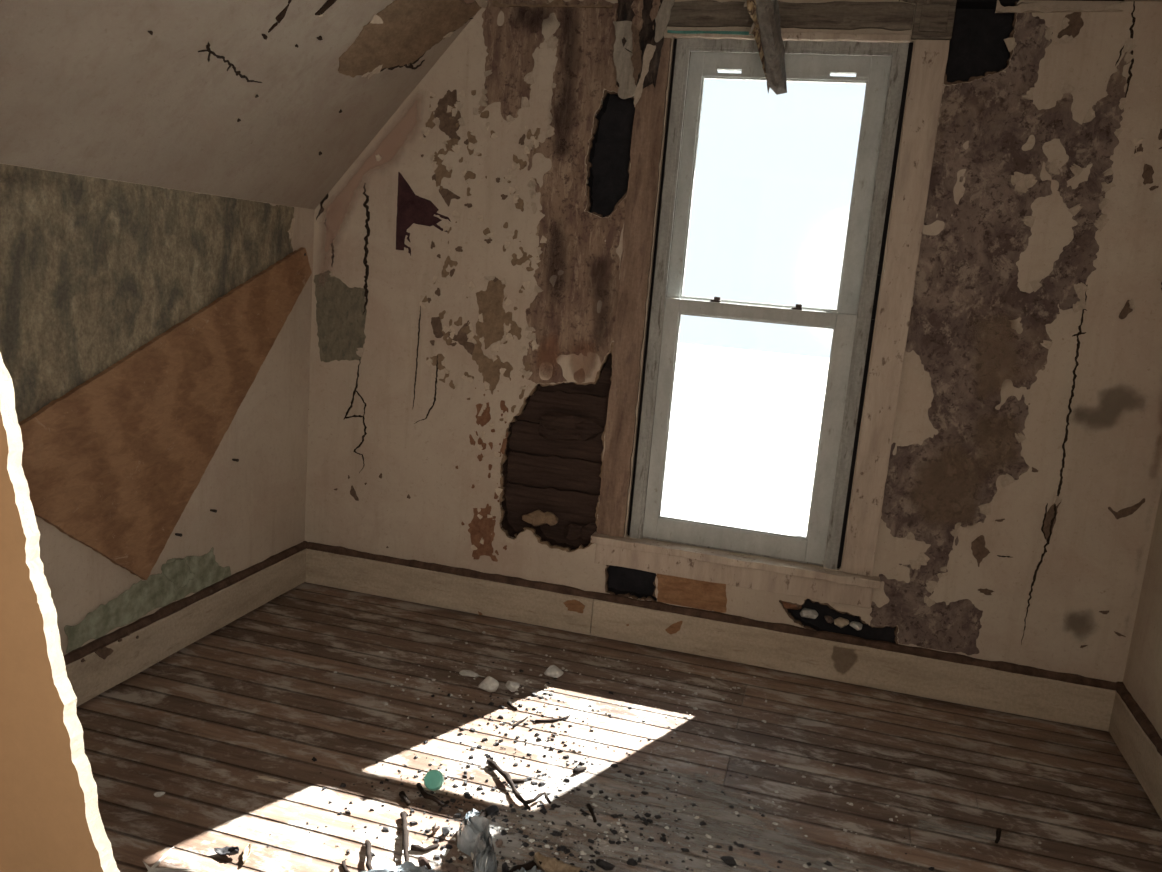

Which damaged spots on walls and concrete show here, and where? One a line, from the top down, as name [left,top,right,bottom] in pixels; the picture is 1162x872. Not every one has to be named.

crack [198,42,262,83]
peeling [313,270,367,362]
peeling [338,0,635,562]
peeling [779,2,1162,655]
crack [344,359,367,473]
crack [997,292,1087,645]
damp [1076,389,1137,425]
peeling [605,565,727,613]